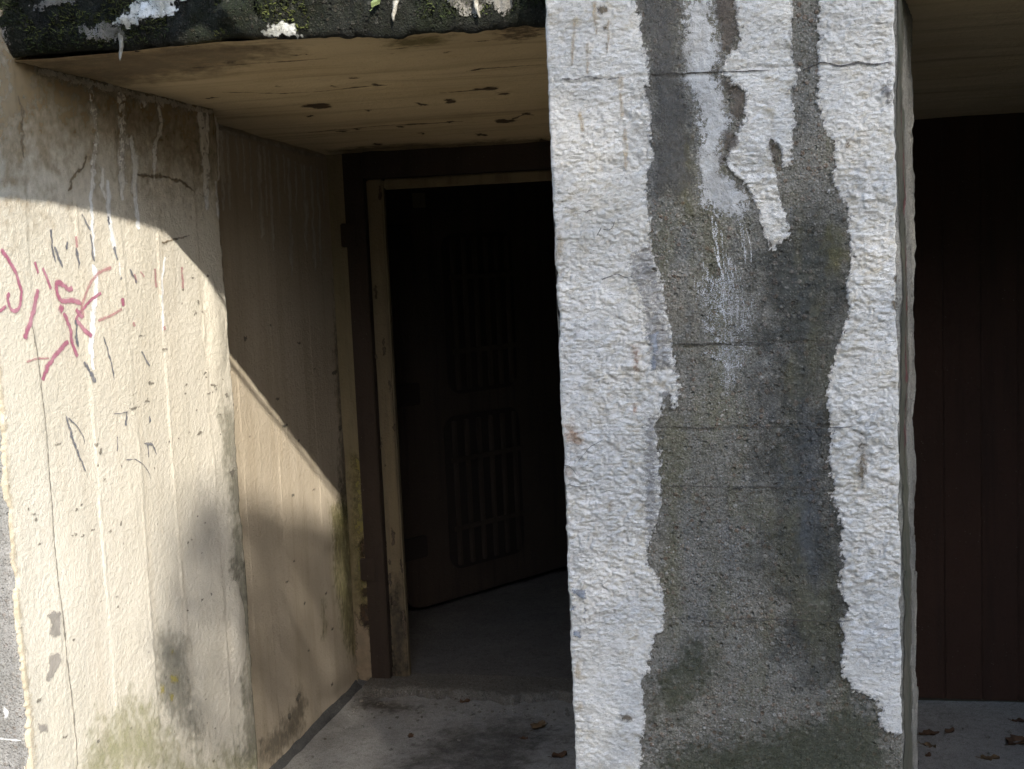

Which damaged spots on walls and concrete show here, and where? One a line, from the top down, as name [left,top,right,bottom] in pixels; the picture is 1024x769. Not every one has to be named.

crack [650,69,766,77]
crack [803,61,892,70]
crack [68,156,87,191]
leakage [0,0,325,370]
crack [137,174,193,191]
peeling [636,0,903,769]
leakage [162,641,199,732]